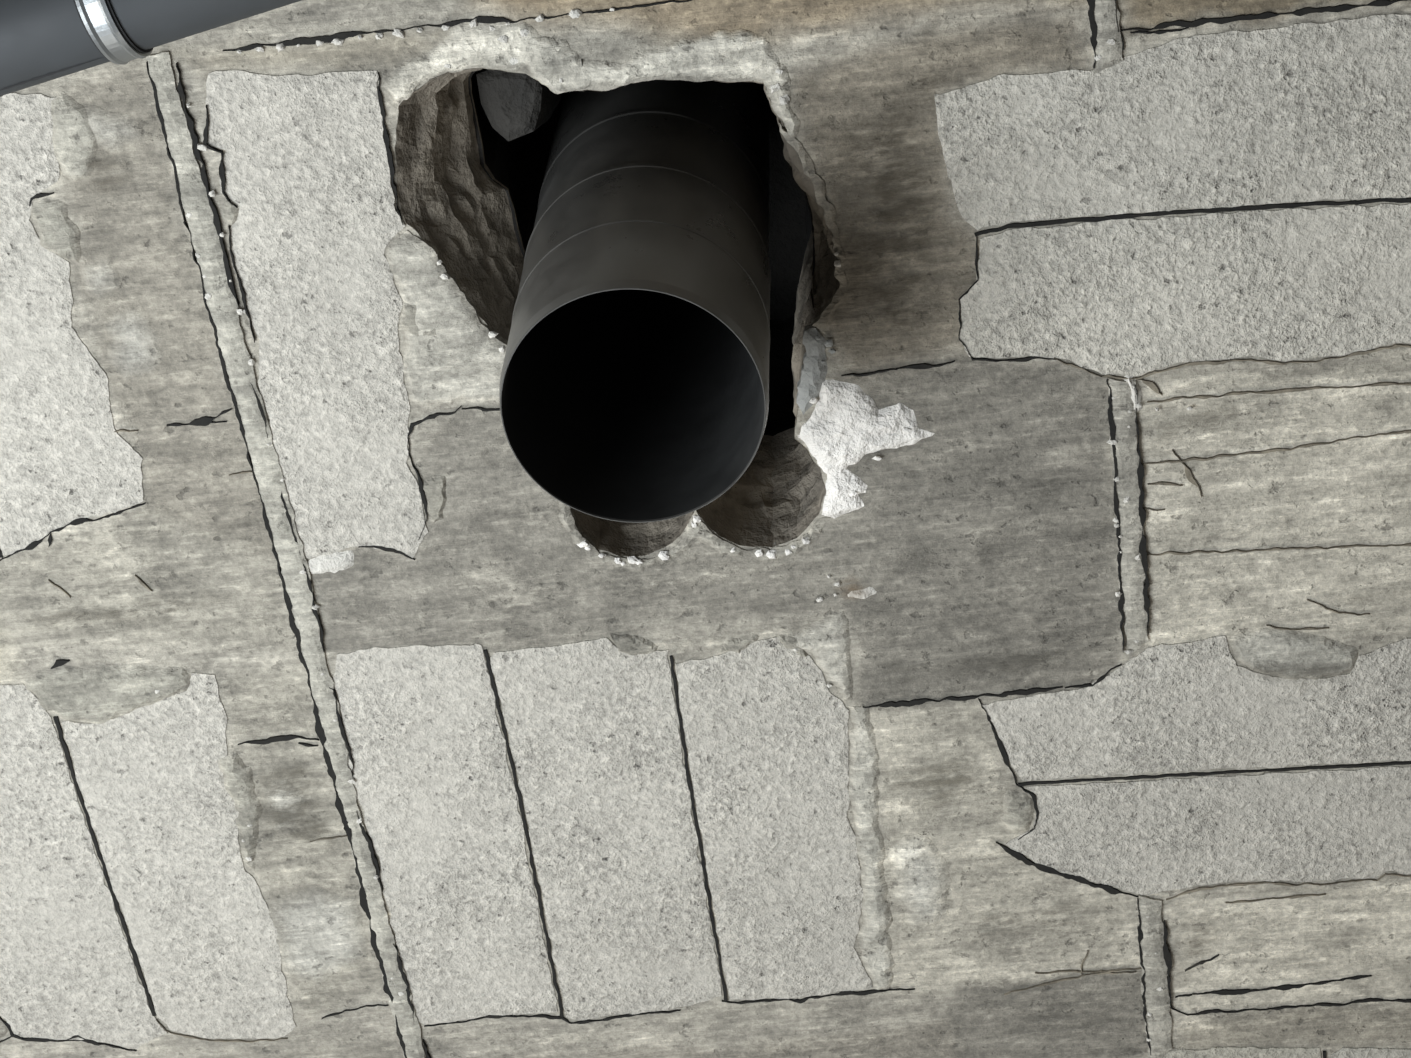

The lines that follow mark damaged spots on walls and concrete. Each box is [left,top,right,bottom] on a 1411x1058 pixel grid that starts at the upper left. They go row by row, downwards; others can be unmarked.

crack [29,192,54,207]
peeling [30,198,81,264]
spalling [382,17,857,573]
spalling [1124,375,1159,413]
crack [0,502,146,598]
crack [114,61,681,1058]
peeling [609,633,658,655]
peeling [718,575,877,702]
crack [841,236,1411,1055]
crack [722,988,915,1004]
crack [0,1017,288,1051]